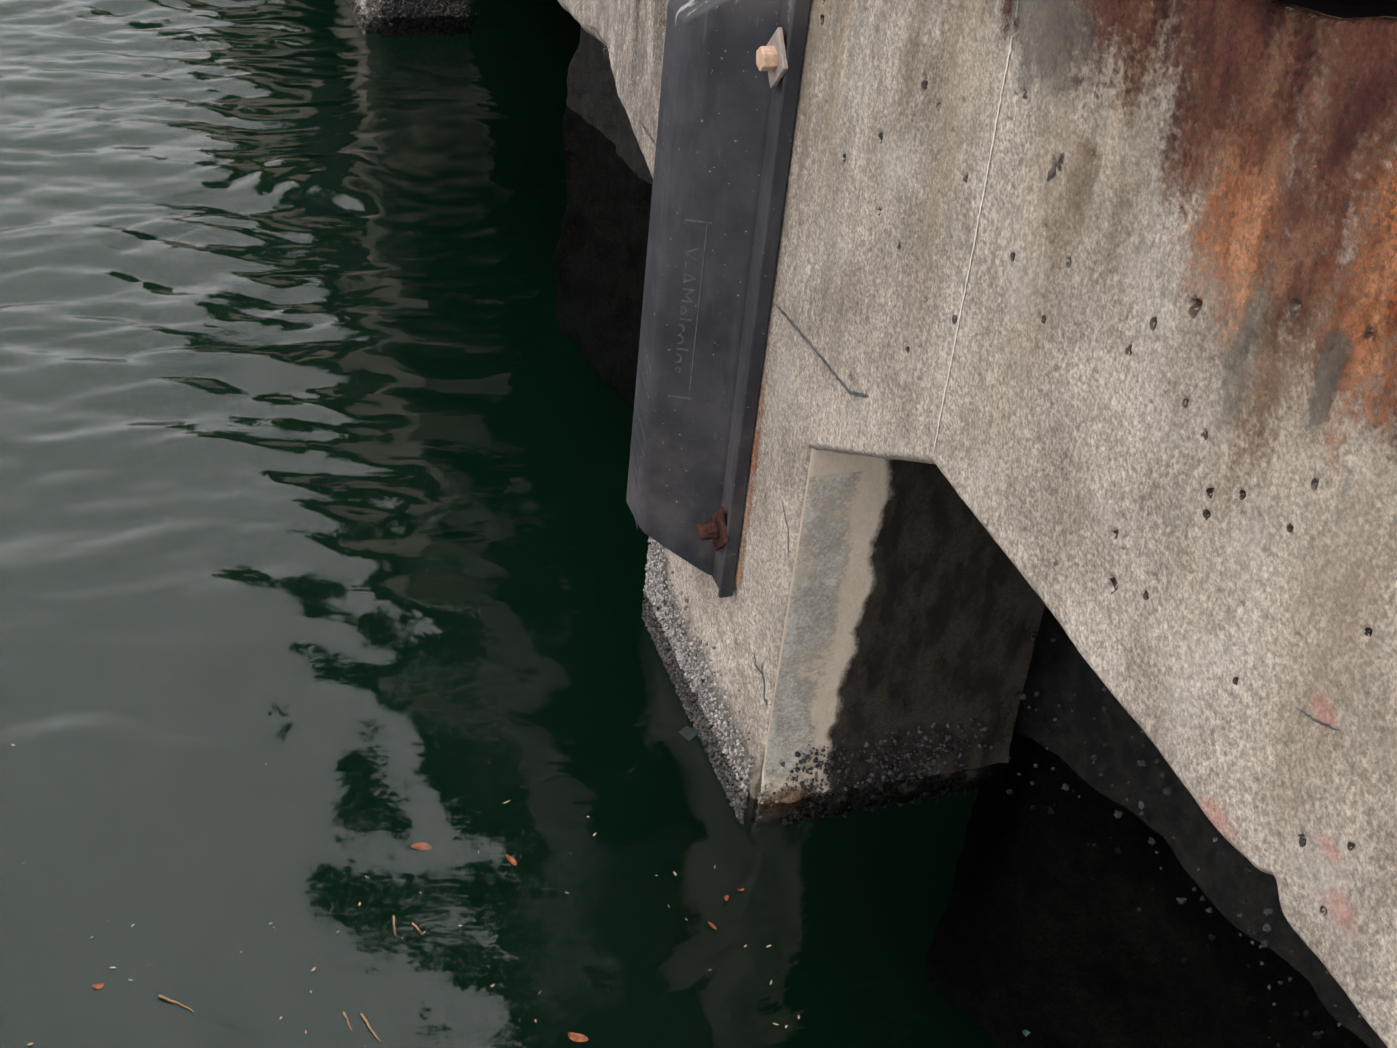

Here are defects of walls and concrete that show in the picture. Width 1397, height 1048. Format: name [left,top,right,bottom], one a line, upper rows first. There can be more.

rust [1066,0,1397,447]